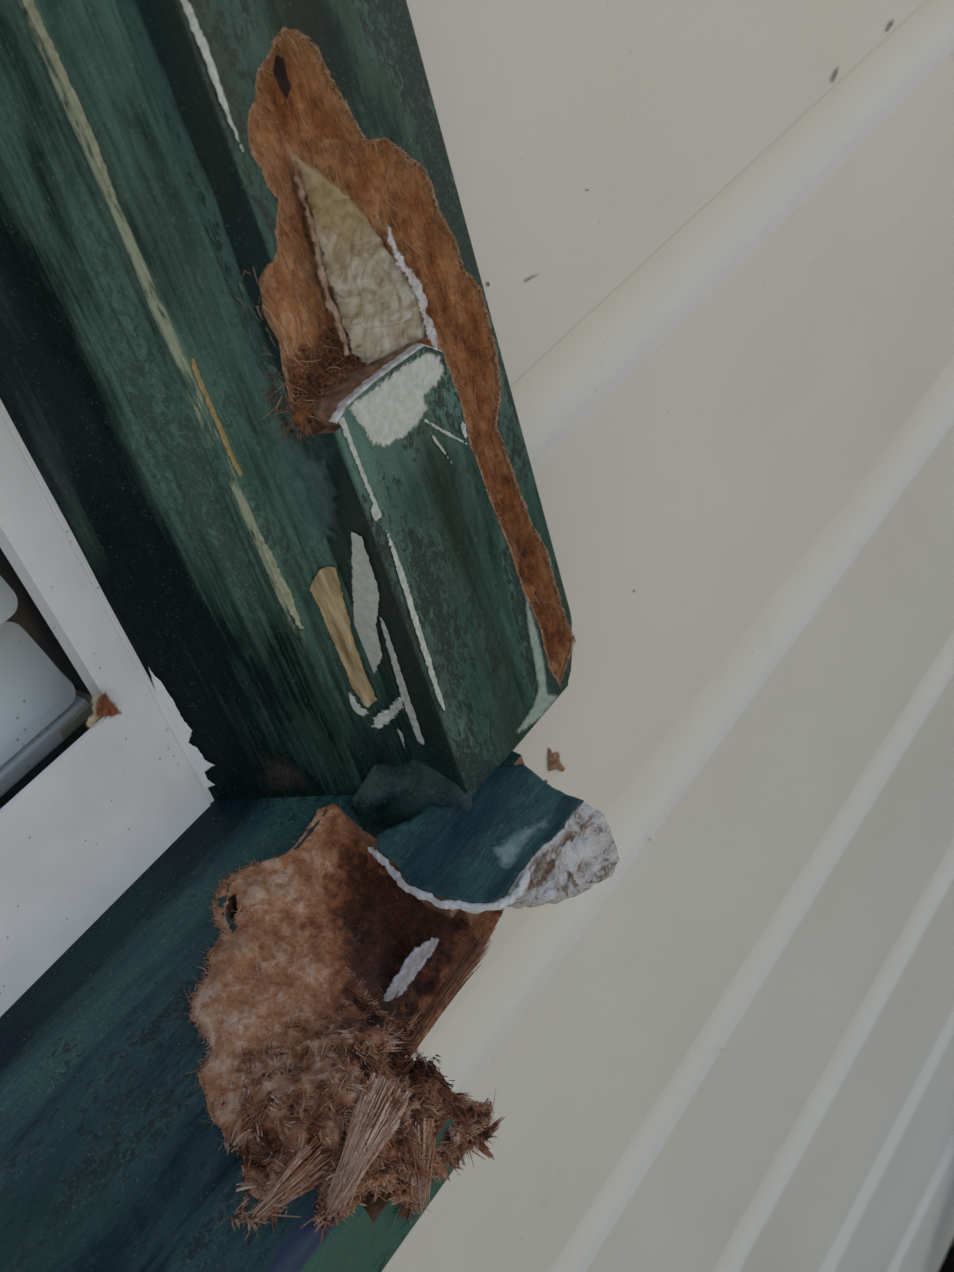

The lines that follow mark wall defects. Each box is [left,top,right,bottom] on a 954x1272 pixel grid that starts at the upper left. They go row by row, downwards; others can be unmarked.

peeling [290,152,349,356]
peeling [328,219,445,711]
peeling [258,533,304,629]
peeling [310,532,424,748]
peeling [518,601,556,732]